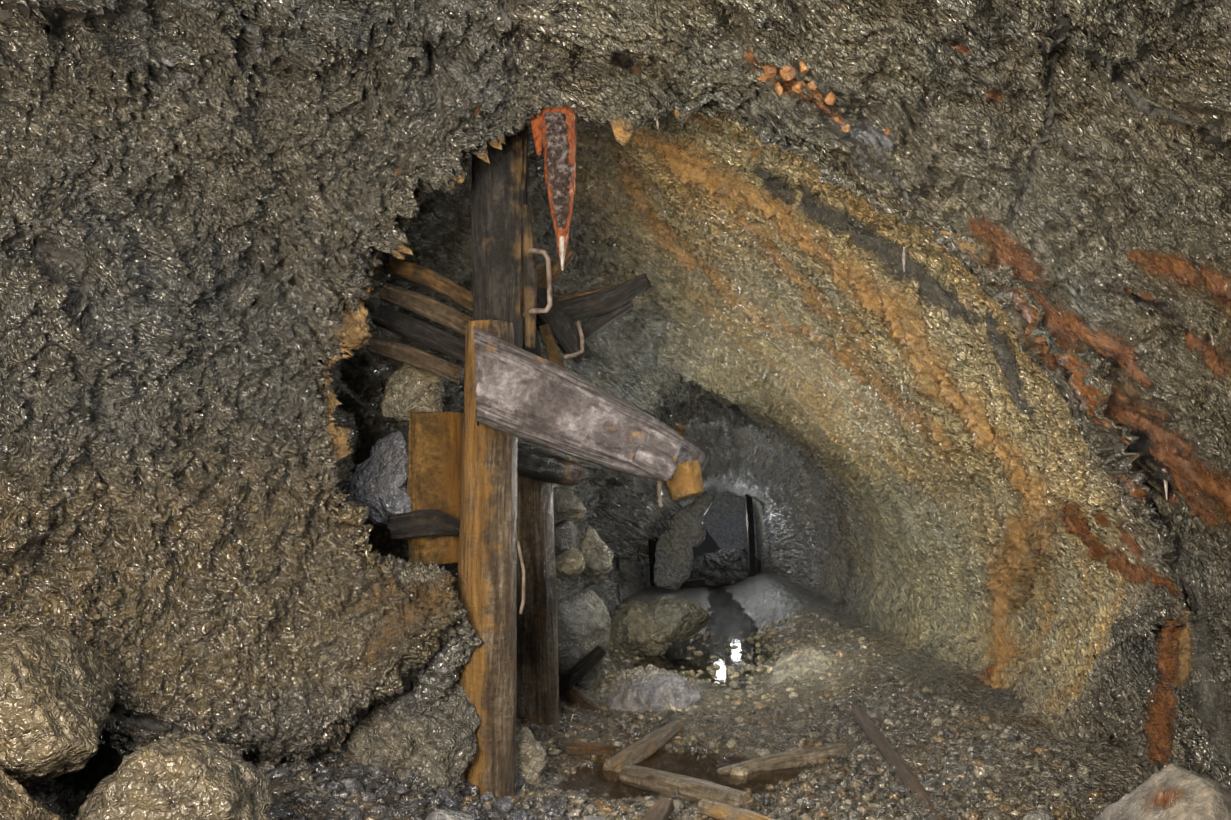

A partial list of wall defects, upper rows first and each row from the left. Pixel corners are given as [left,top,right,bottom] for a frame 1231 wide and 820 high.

corrosion [612,122,1231,765]